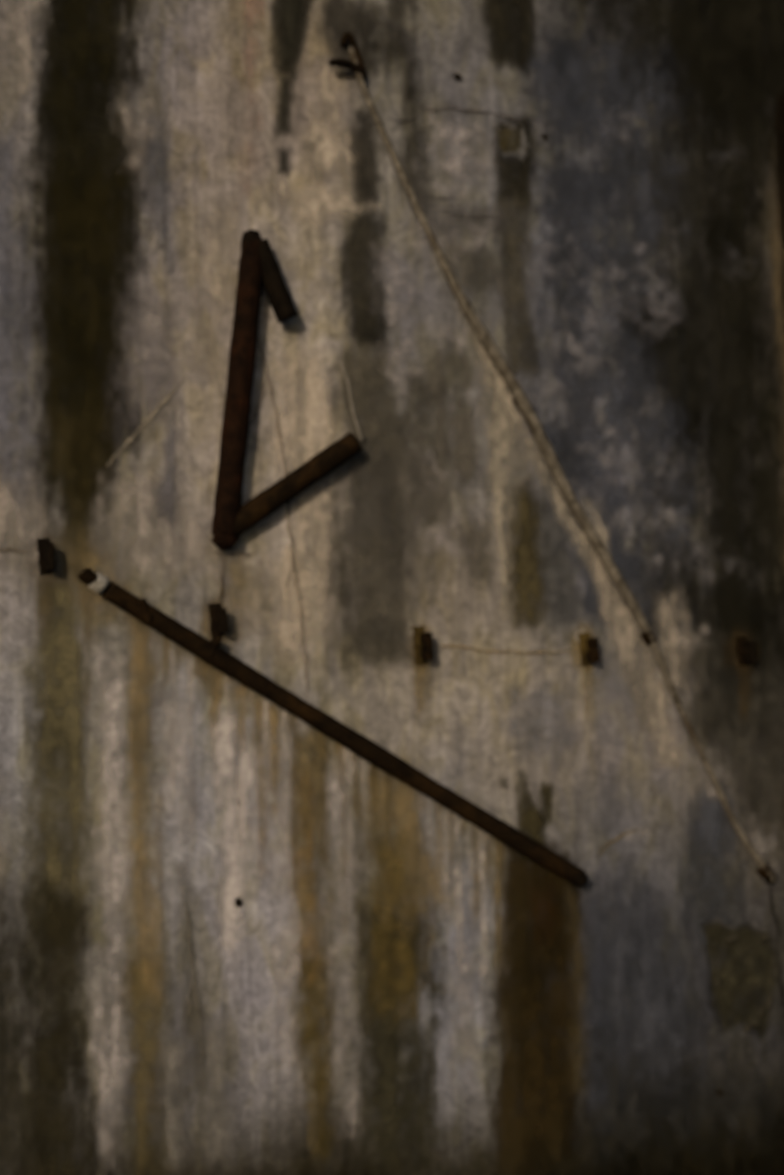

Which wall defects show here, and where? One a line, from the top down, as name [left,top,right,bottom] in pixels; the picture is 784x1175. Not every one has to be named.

leakage [0,488,38,556]
leakage [33,0,168,571]
leakage [123,426,193,569]
leakage [270,0,784,821]
leakage [0,894,98,1175]
leakage [160,1047,182,1161]
leakage [216,720,253,938]
corrosion [236,685,296,843]
leakage [331,751,353,845]
corrosion [321,733,441,1175]
corrosion [474,833,580,1175]
leakage [570,882,784,1175]